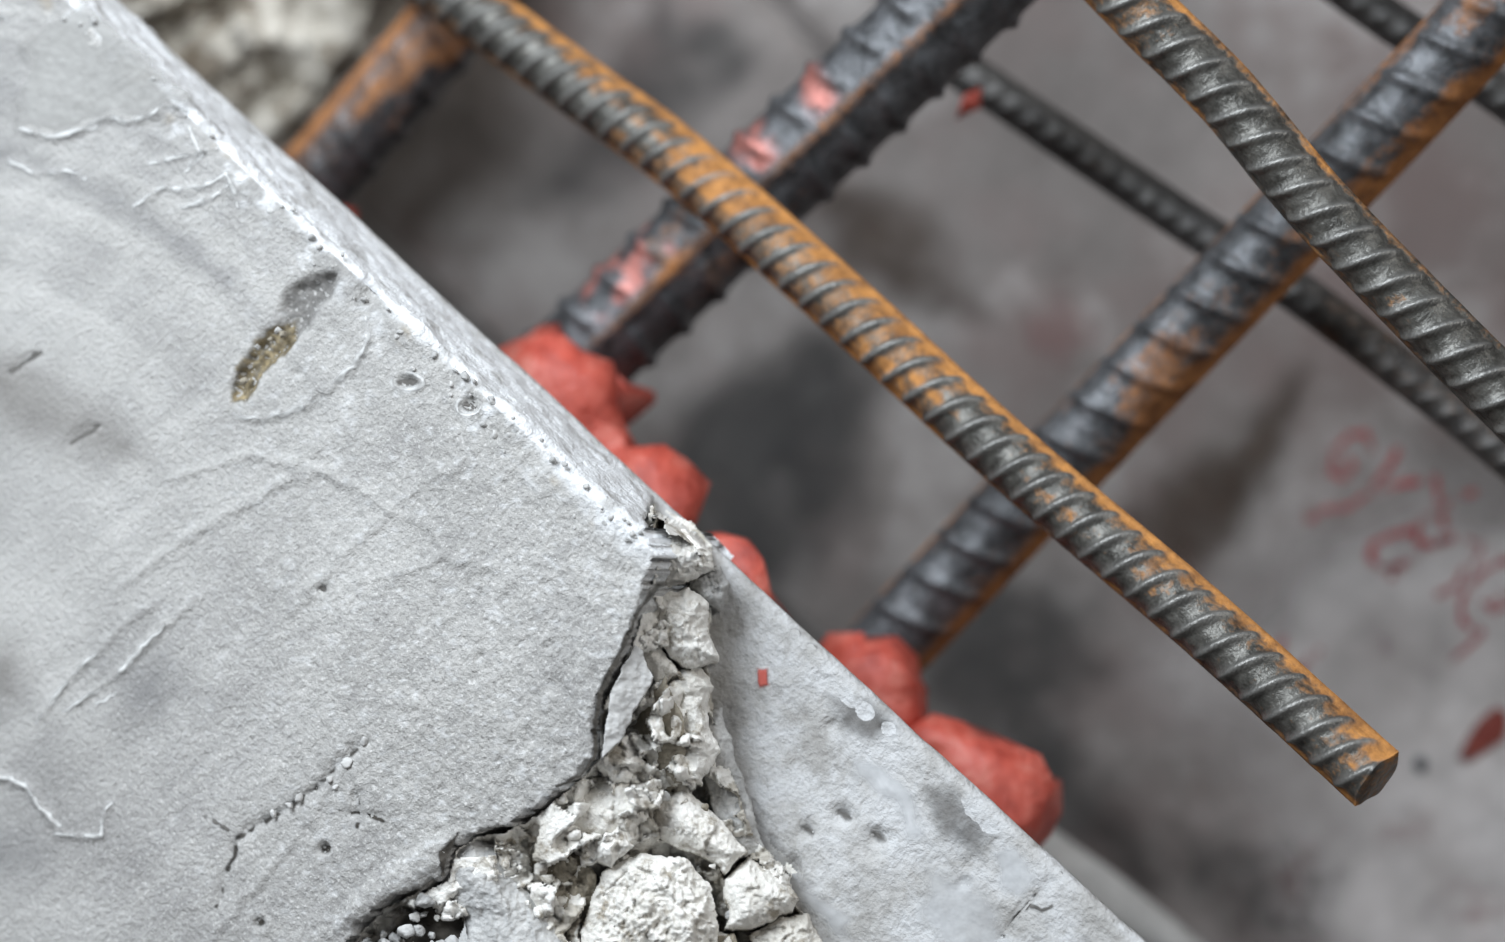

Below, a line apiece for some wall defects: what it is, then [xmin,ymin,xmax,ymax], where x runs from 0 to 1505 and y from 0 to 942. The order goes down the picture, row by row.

peeling [8,2,239,209]
spalling [118,0,1505,806]
spalling [355,504,823,942]
crack [556,580,685,787]
crack [358,832,459,942]